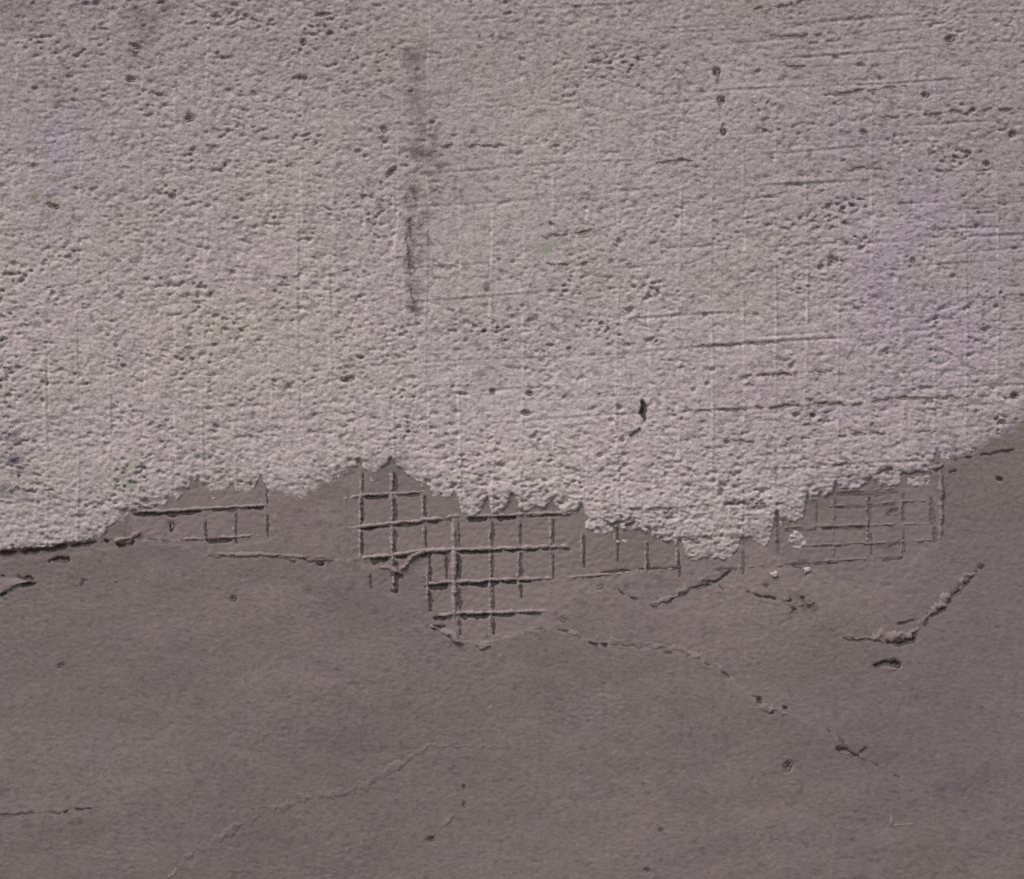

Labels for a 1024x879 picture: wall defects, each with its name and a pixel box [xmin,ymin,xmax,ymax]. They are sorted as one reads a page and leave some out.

spalling [119,473,283,552]
spalling [339,458,682,650]
crack [498,616,730,679]
crack [615,569,776,608]
spalling [716,461,948,590]
crack [833,564,985,672]
crack [827,728,900,779]